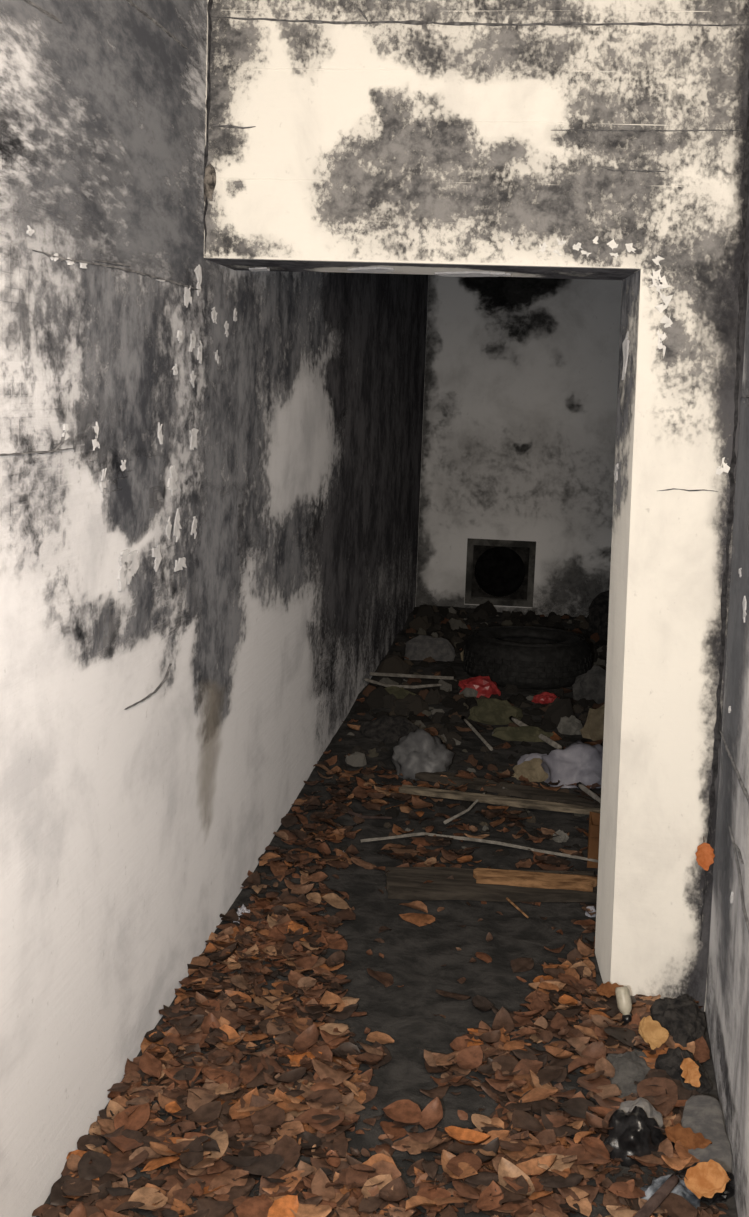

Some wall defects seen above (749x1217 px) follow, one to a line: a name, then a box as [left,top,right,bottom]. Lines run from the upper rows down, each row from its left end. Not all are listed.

peeling [539,236,636,259]
peeling [649,256,673,358]
peeling [92,422,100,451]
peeling [99,460,126,492]
peeling [117,465,197,591]
peeling [189,428,199,450]
leakage [0,0,641,778]
leakage [314,0,749,1023]
crack [659,486,718,494]
leakage [716,1013,735,1136]